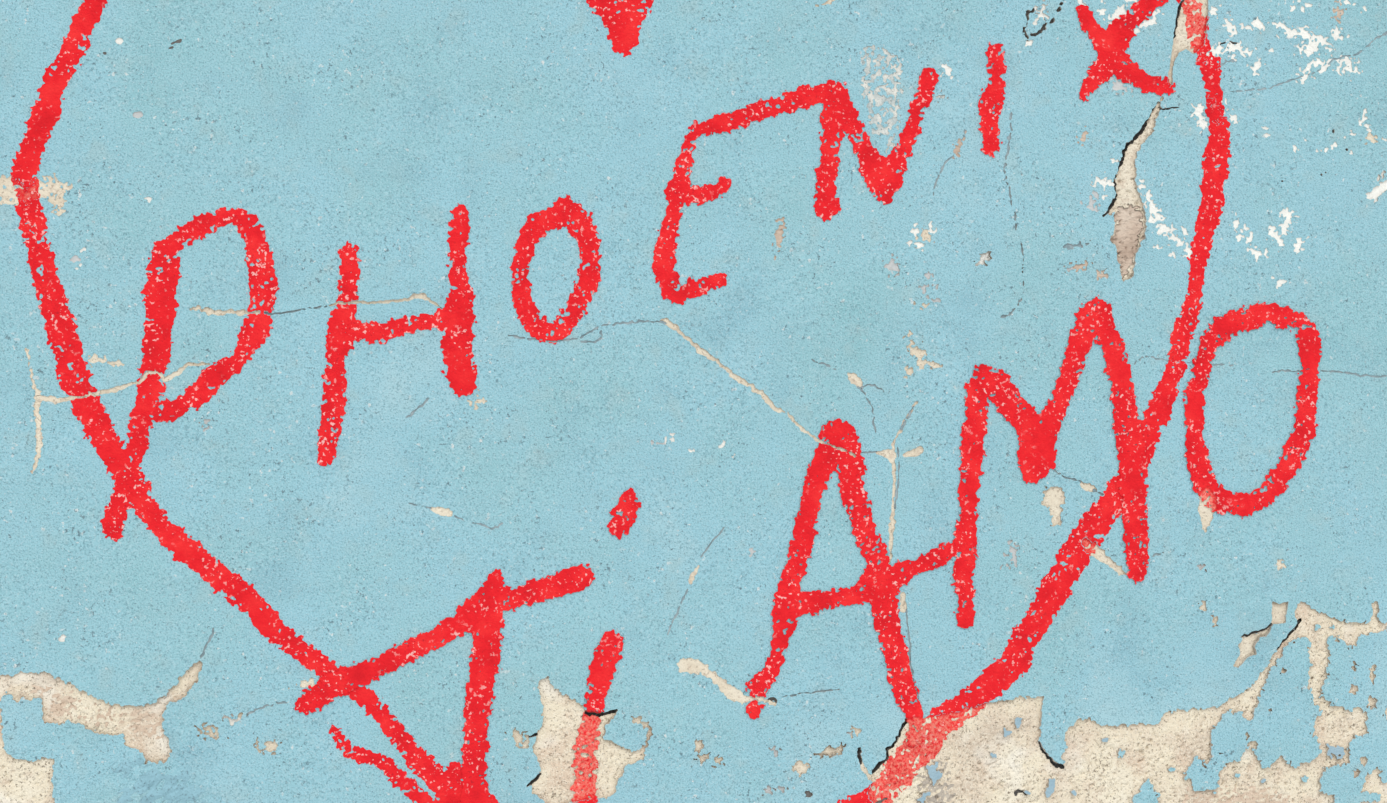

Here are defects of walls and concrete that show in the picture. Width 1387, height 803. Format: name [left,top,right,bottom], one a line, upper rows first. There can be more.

peeling [0,173,73,216]
spalling [1023,0,1367,281]
spalling [1366,171,1387,202]
crack [190,293,442,316]
crack [24,348,210,474]
crack [409,503,503,530]
crack [508,318,923,706]
peeling [0,661,203,803]
crack [200,628,214,658]
peeling [504,676,653,803]
crack [857,747,887,803]
peeling [871,601,1387,803]